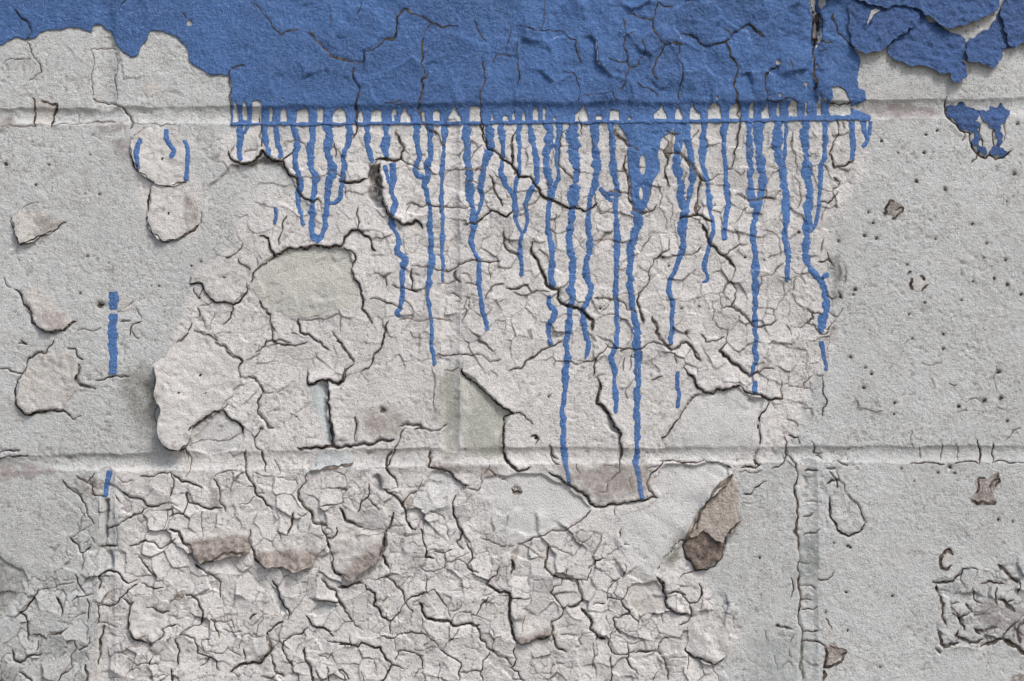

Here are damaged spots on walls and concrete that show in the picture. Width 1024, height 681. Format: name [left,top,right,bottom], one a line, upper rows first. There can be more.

peeling [847,0,1024,83]
peeling [944,101,1019,157]
peeling [12,209,63,244]
peeling [190,246,359,317]
peeling [152,329,245,454]
crack [0,48,867,681]
peeling [614,385,763,614]
spalling [971,472,1001,505]
peeling [183,521,387,583]
crack [932,548,1024,655]